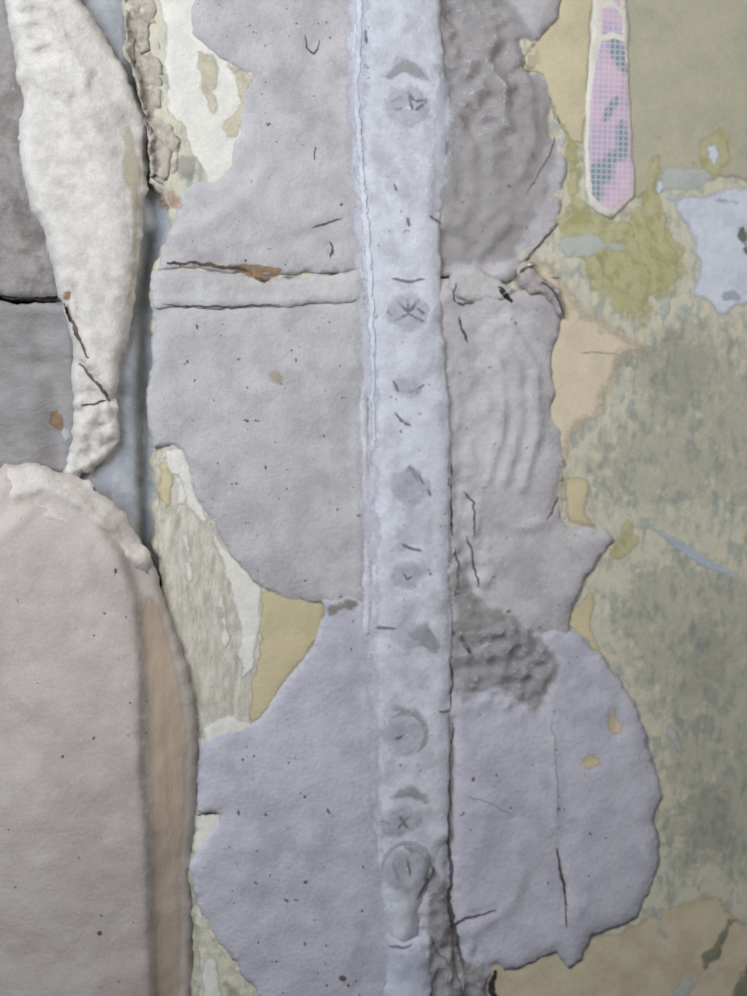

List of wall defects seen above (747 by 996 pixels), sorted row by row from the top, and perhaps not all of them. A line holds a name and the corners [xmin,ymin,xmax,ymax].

peeling [124,0,253,185]
peeling [523,0,593,143]
peeling [626,0,747,315]
corrosion [230,264,290,282]
crack [0,295,110,406]
peeling [516,259,644,525]
peeling [156,445,325,742]
crack [448,464,480,597]
peeling [192,811,220,852]
crack [430,635,497,996]
crack [556,848,568,928]
peeling [485,897,747,996]